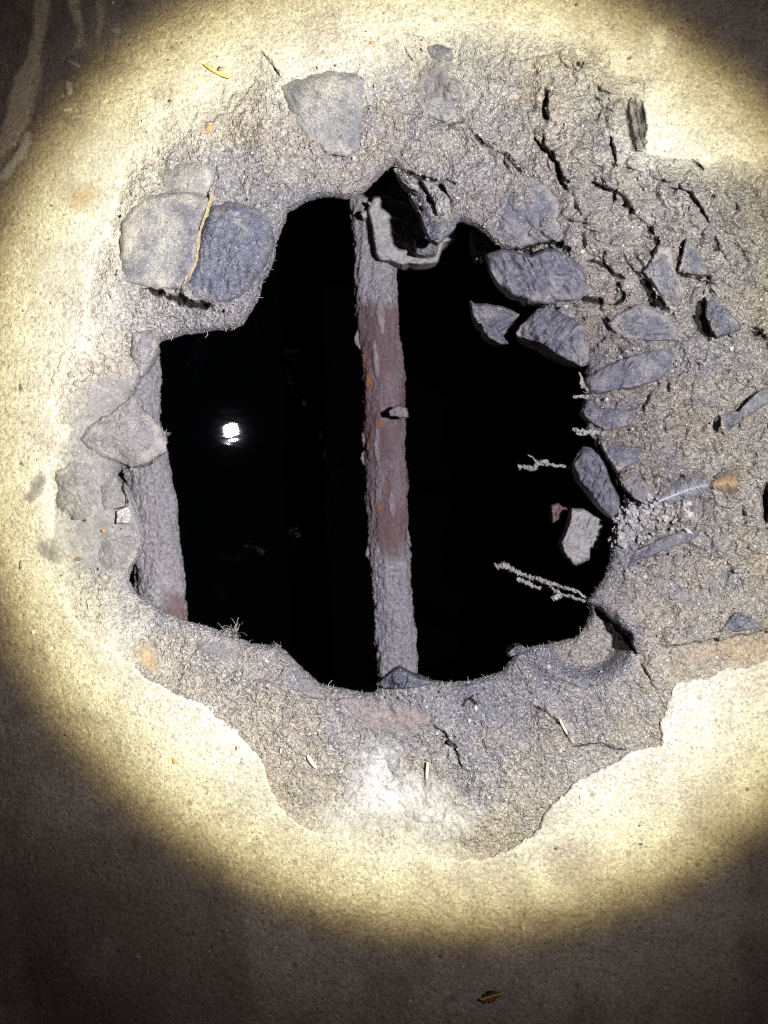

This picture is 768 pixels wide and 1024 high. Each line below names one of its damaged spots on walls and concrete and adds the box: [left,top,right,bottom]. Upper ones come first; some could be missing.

crack [467,123,525,177]
crack [533,89,618,204]
crack [144,178,217,309]
crack [508,226,717,339]
corrosion [348,169,418,690]
spalling [47,23,768,860]